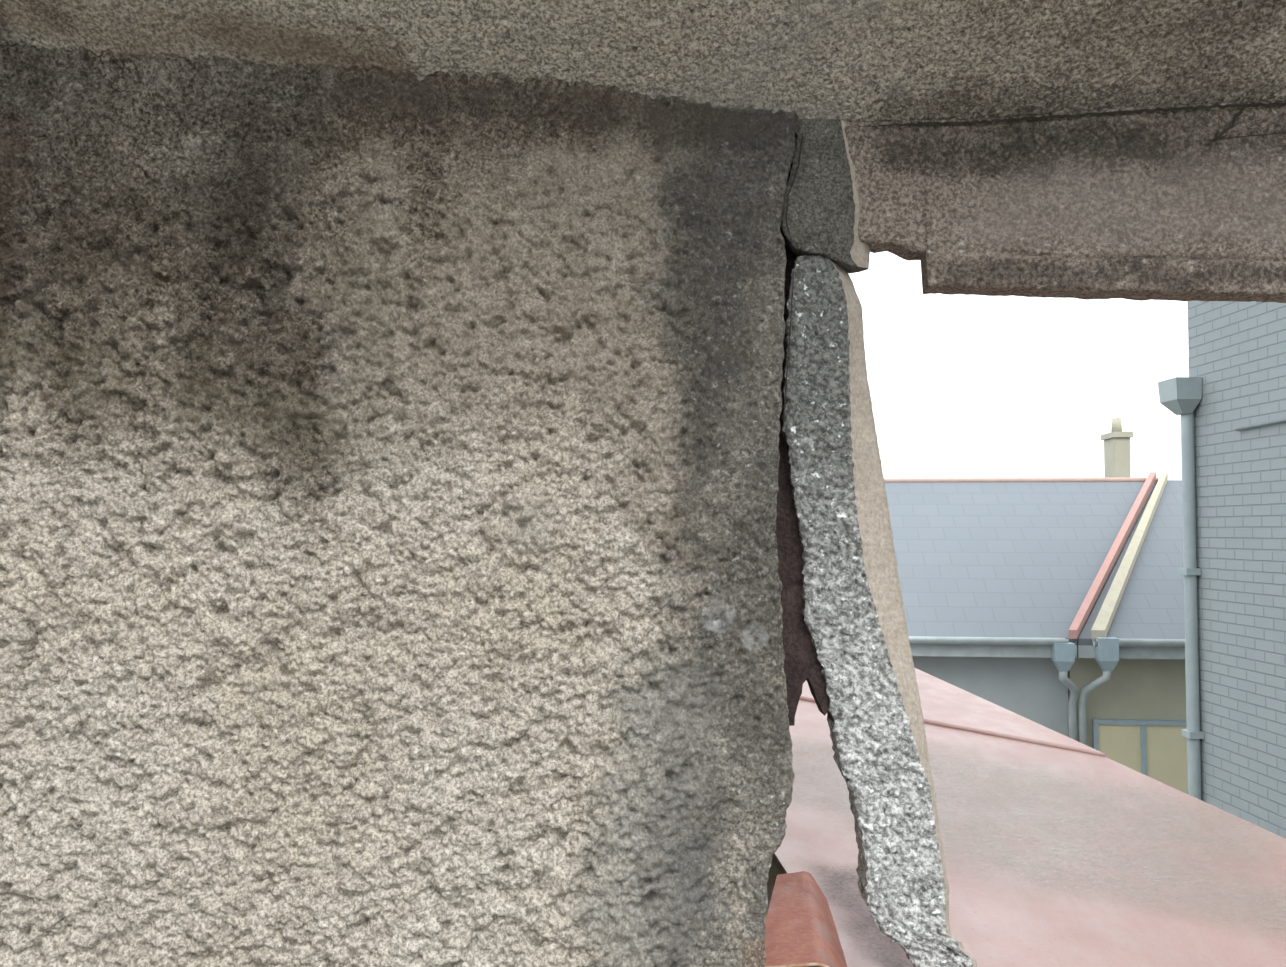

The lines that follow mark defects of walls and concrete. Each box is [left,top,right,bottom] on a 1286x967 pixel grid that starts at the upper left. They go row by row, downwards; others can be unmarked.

damp [0,42,799,967]
crack [857,100,1286,143]